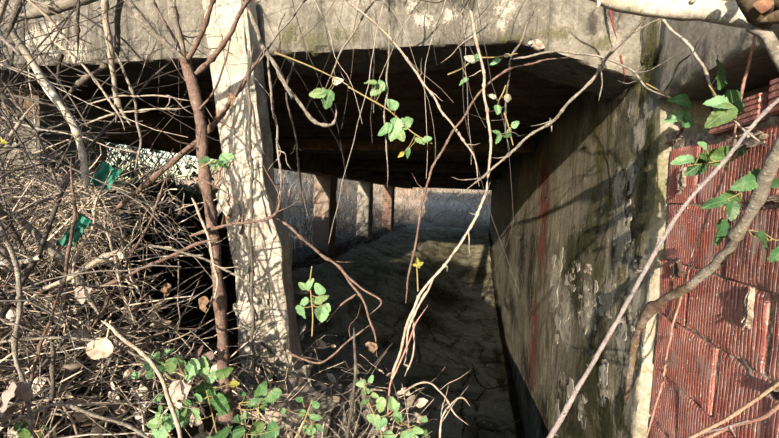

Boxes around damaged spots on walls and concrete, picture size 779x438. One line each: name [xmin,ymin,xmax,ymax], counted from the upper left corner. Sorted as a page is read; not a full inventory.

water stain [405,0,474,27]
water stain [495,0,515,30]
peeling [216,184,269,331]
peeling [549,247,635,354]
peeling [619,166,642,292]
water stain [610,93,655,390]
crack [672,281,680,329]
crack [438,354,509,436]